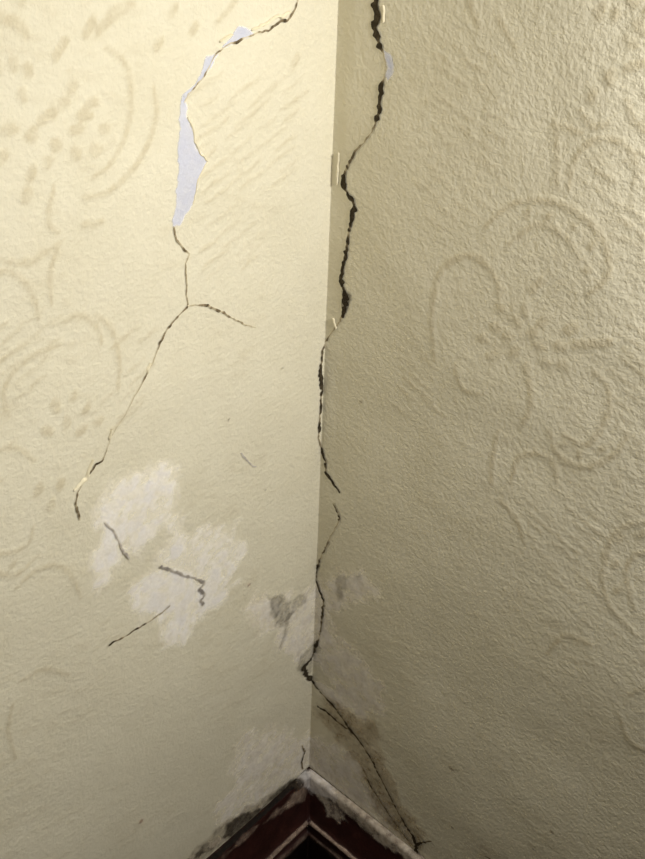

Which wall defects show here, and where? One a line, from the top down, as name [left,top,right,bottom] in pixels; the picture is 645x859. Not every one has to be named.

peeling [173,27,253,226]
crack [184,1,298,103]
crack [74,227,256,520]
crack [301,0,432,854]
crack [109,605,170,646]
flaking render [132,545,233,634]